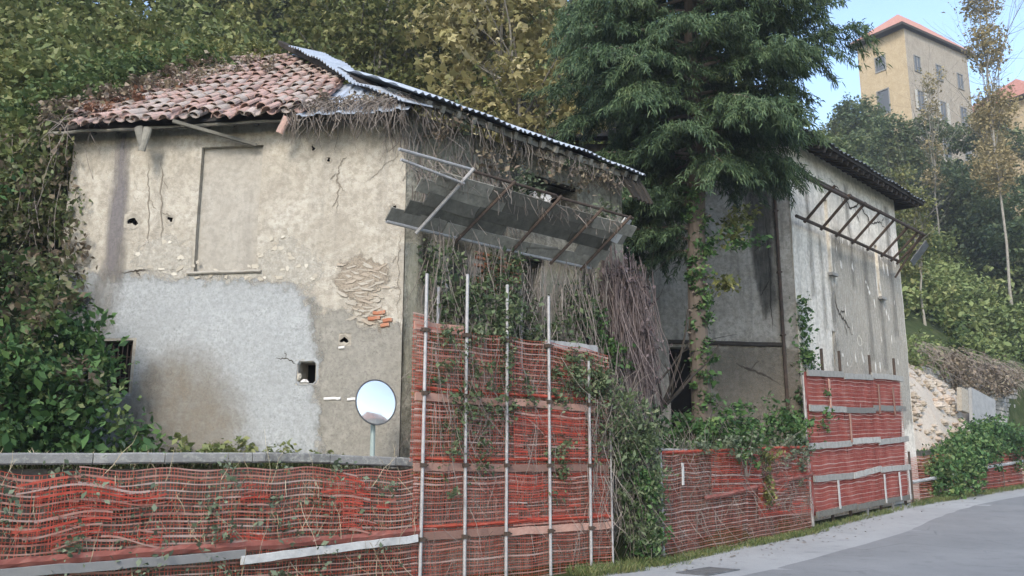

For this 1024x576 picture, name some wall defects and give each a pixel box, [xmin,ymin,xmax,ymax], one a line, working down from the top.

damp [104,132,127,277]
crack [122,162,178,276]
peeling [131,213,393,349]
crack [330,157,347,212]